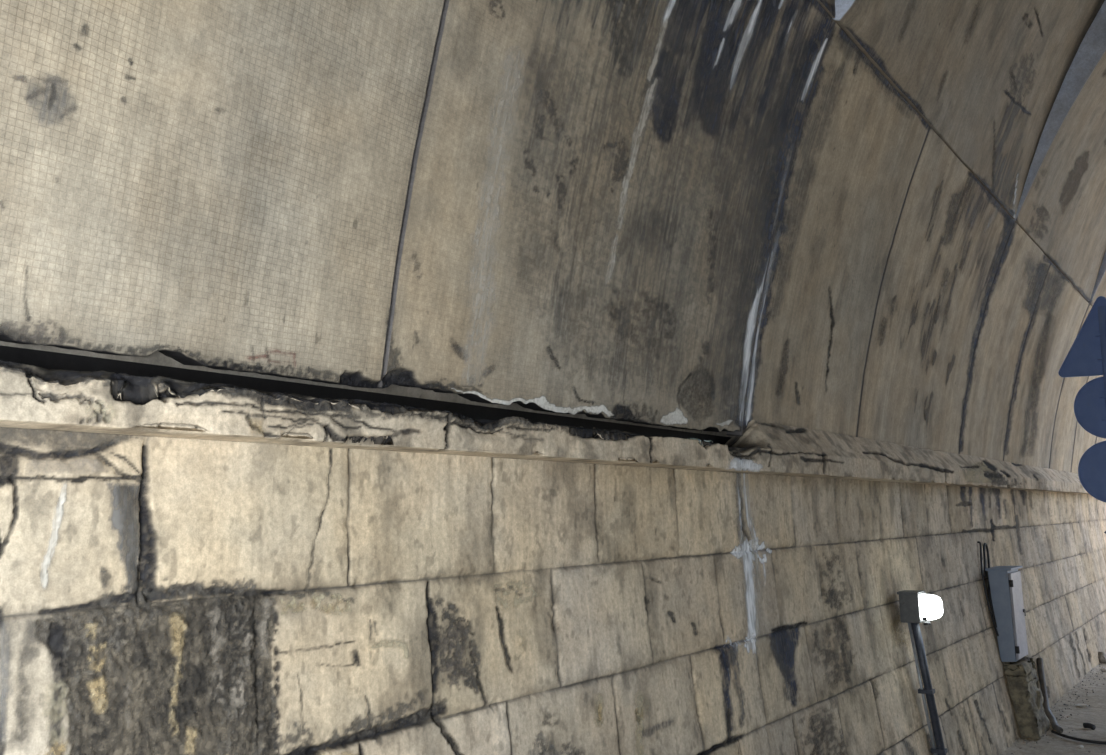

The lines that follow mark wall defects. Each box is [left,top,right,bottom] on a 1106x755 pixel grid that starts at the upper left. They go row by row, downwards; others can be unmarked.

damp [592,0,932,430]
damp [908,56,1048,451]
spalling [1,318,66,344]
spalling [324,425,419,445]
spalling [347,390,637,449]
peeling [660,343,732,426]
damp [108,483,140,594]
crack [176,402,394,591]
crack [726,423,943,652]
crack [472,606,512,706]
damp [769,622,807,706]
crack [431,715,462,755]